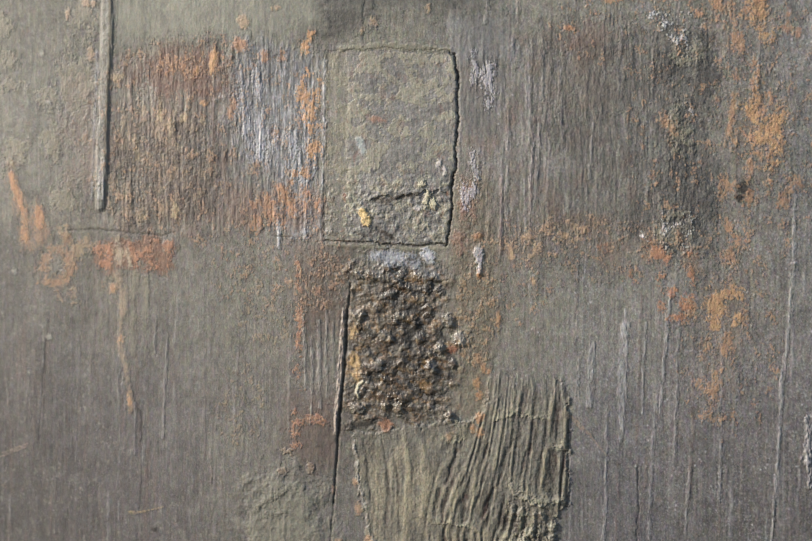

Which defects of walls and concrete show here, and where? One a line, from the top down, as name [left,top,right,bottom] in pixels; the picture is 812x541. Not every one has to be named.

crack [67,227,176,237]
peeling [0,0,335,244]
corrosion [0,12,363,496]
peeling [265,222,314,250]
crack [329,283,352,541]
peeling [357,205,373,227]
crack [320,0,461,248]
spalling [324,212,465,450]
spalling [479,491,559,541]
corrosion [440,0,812,444]